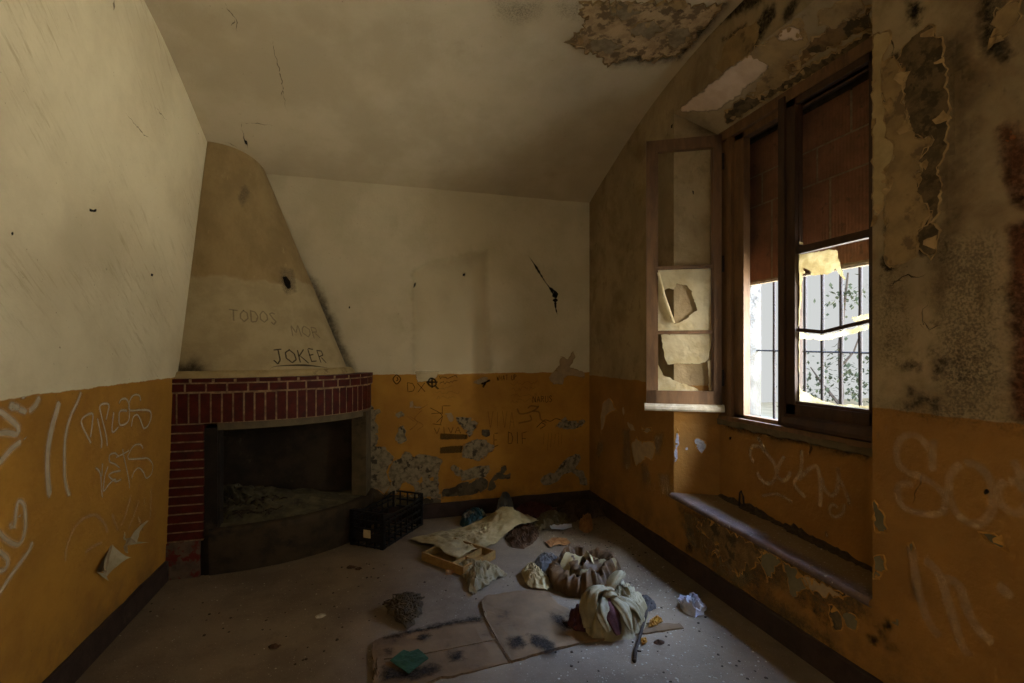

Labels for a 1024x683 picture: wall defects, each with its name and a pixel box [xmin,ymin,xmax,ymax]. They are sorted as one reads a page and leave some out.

spalling [563,0,723,68]
peeling [987,0,1022,50]
flaking render [714,4,952,260]
peeling [370,405,511,500]
peeling [674,428,707,462]
peeling [696,518,762,577]
peeling [799,572,850,632]